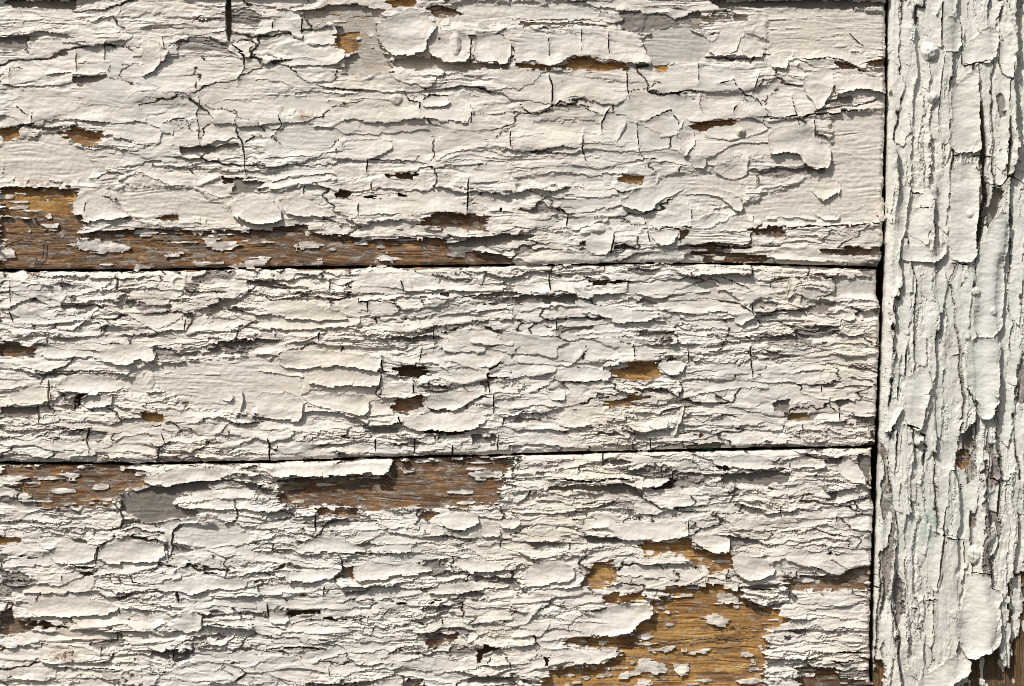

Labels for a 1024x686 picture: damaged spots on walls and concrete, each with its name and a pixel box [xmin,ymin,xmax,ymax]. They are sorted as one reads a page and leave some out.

crack [226,0,245,79]
crack [509,19,609,161]
crack [637,59,861,159]
peeling [0,0,1024,473]
crack [762,222,878,231]
crack [952,110,1013,265]
crack [379,330,434,393]
crack [487,359,509,413]
peeling [0,371,308,684]
peeling [193,330,885,686]
crack [549,445,628,482]
crack [830,651,862,663]